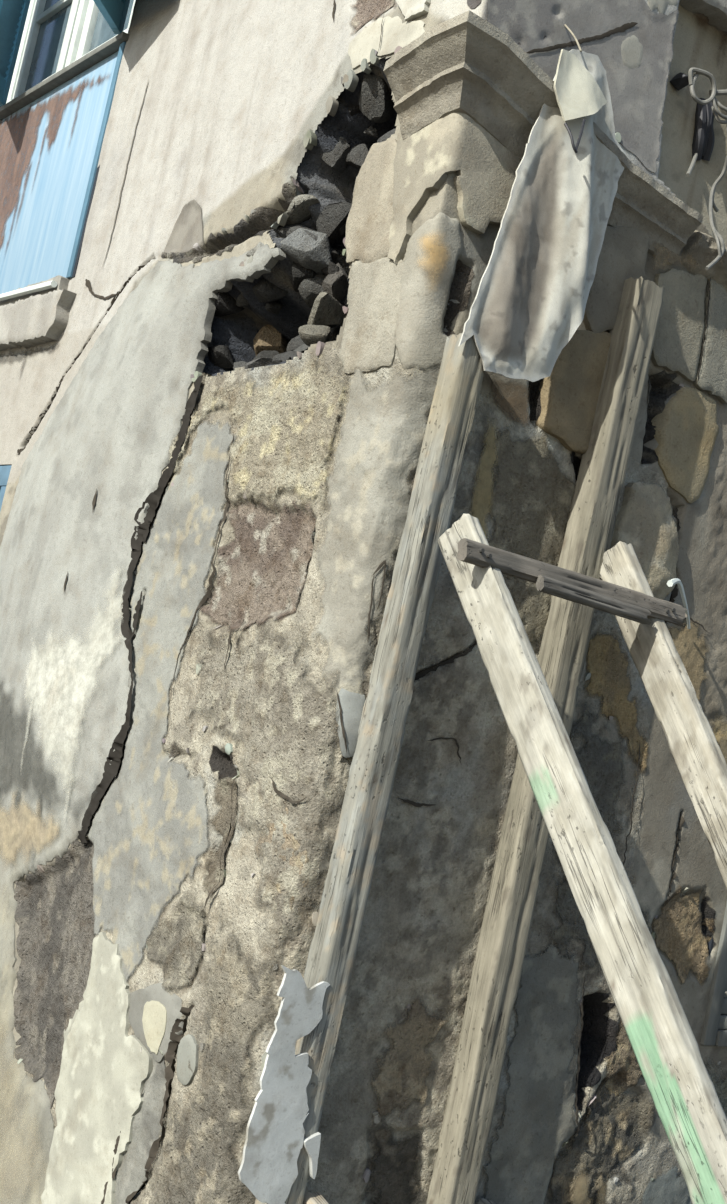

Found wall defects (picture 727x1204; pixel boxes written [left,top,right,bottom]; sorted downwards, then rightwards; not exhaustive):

rust [0,76,102,248]
flaking render [467,0,679,173]
crack [77,375,203,844]
spalling [13,0,521,1204]
spalling [651,887,716,984]
spalling [549,993,655,1204]